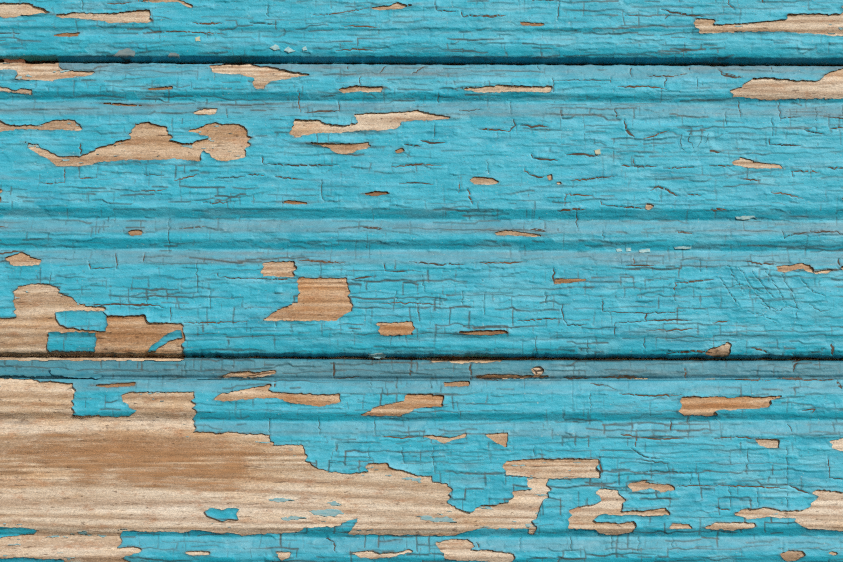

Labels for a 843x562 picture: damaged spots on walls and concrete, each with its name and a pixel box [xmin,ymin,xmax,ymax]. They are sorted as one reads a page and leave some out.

peeling [25,108,252,166]
crack [141,157,332,200]
peeling [289,110,450,154]
crack [392,126,445,185]
crack [524,150,729,227]
peeling [0,283,185,357]
crack [83,259,520,324]
peeling [261,261,353,321]
crack [602,261,728,349]
peeling [0,366,600,562]
crack [621,422,809,510]
peeling [706,489,843,531]